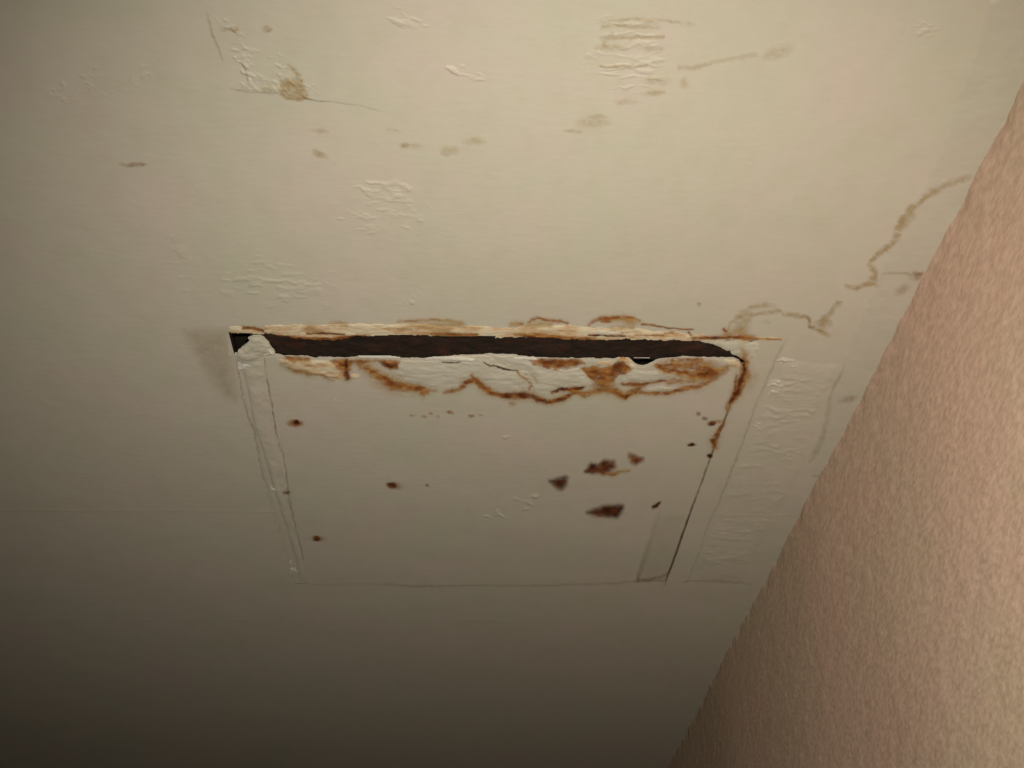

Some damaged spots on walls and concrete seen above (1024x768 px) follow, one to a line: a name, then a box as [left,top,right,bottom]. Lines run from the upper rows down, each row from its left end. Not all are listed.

rust [276,322,365,341]
rust [402,319,478,336]
rust [285,356,327,378]
rust [332,358,431,396]
peeling [359,356,591,395]
peeling [229,324,782,381]
rust [444,316,781,410]
peeling [597,357,676,392]
rust [707,421,722,458]
rust [550,477,567,489]
rust [585,455,643,476]
rust [589,506,623,517]